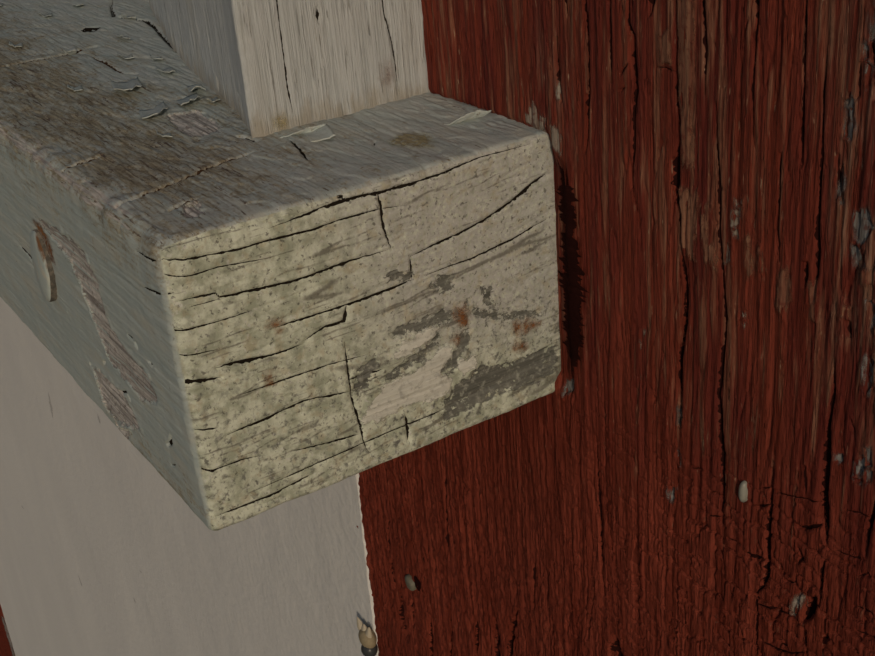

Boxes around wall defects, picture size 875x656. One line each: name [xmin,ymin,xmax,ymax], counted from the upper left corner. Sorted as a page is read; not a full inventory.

peeling [139,84,222,137]
crack [290,140,308,160]
crack [137,144,528,331]
peeling [850,209,874,265]
peeling [36,217,157,403]
crack [179,174,546,516]
crack [693,106,805,656]
peeling [836,448,873,485]
crack [840,502,875,576]